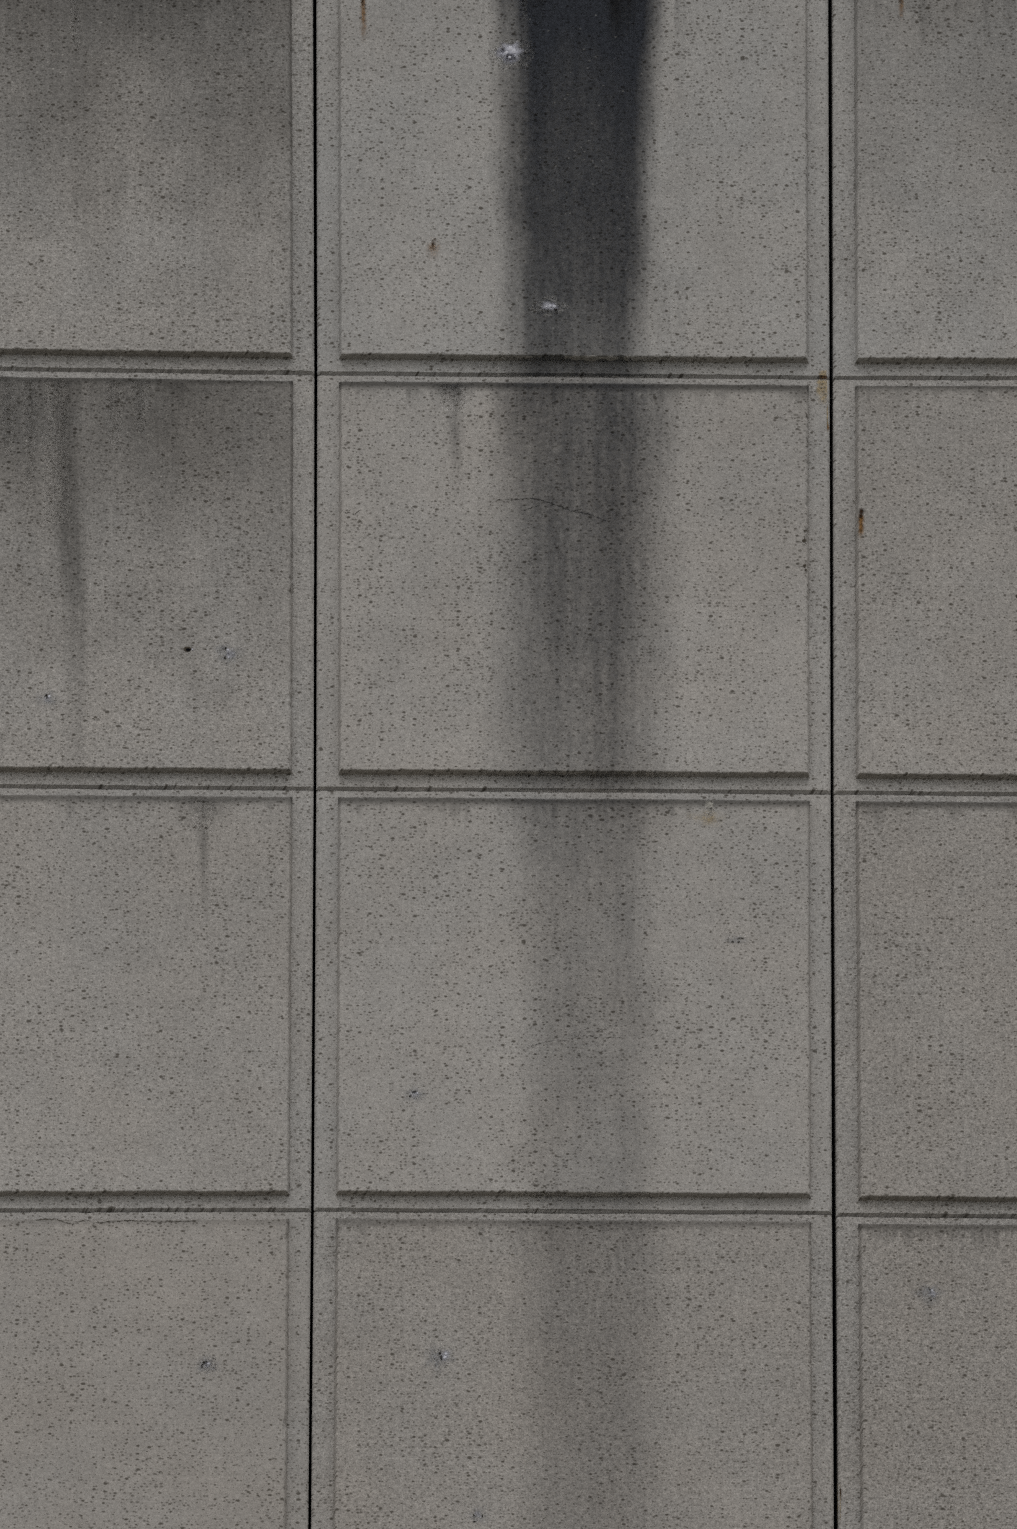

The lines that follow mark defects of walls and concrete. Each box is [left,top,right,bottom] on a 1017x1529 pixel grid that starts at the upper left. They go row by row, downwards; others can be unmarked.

water stain [514,0,654,643]